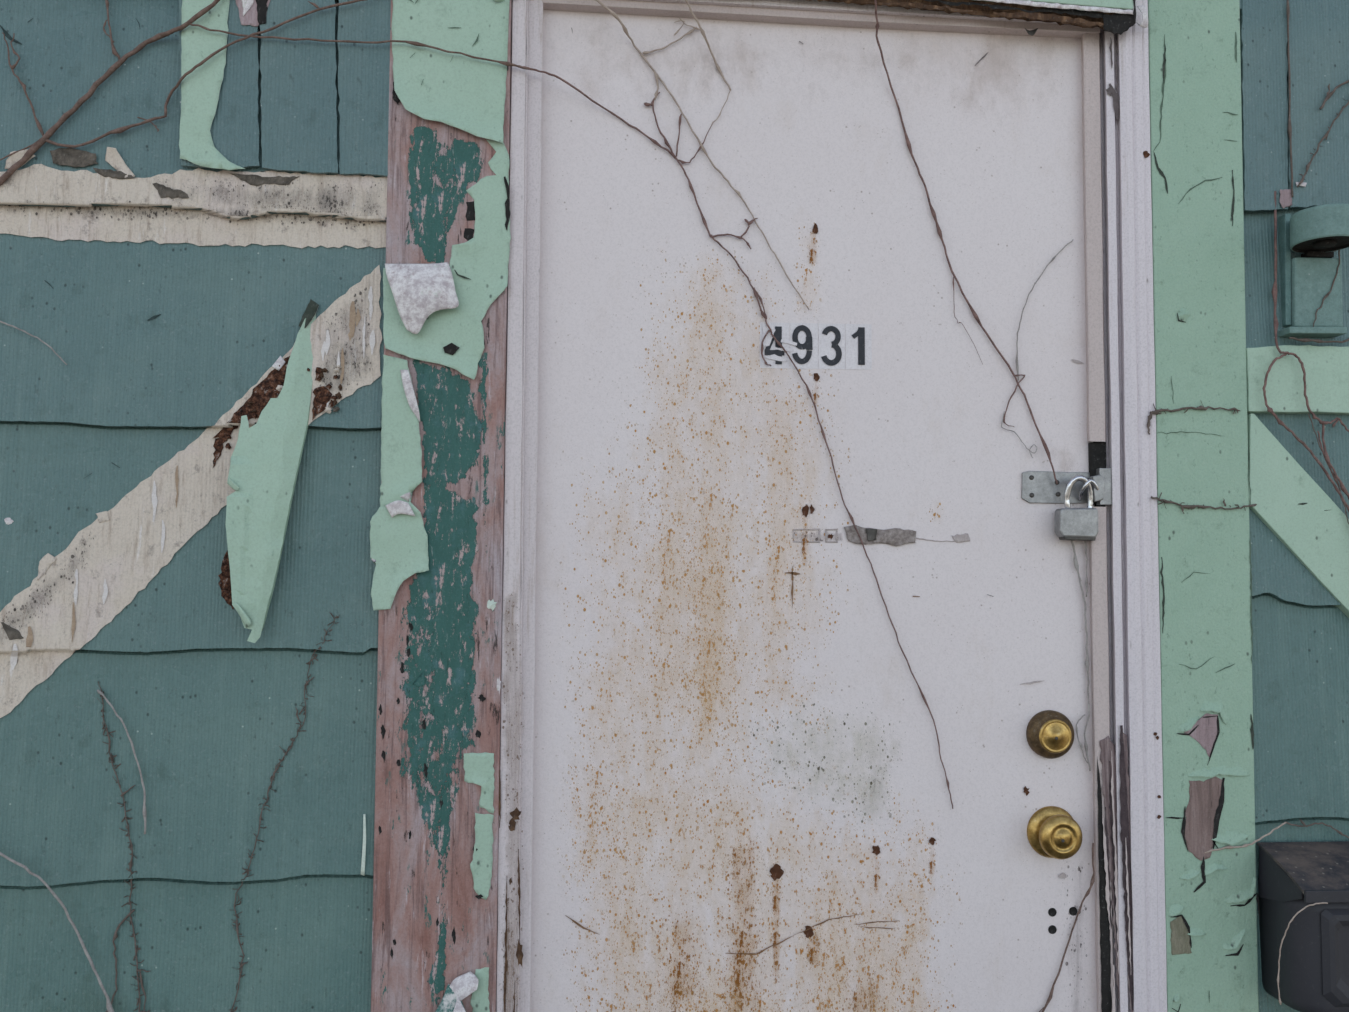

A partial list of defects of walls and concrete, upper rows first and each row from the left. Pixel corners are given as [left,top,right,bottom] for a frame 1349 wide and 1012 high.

corrosion [797,222,820,309]
peeling [0,0,511,1012]
corrosion [554,255,956,1012]
peeling [1167,700,1250,892]
peeling [1168,904,1206,955]
peeling [1223,929,1246,956]
peeling [1225,877,1260,921]